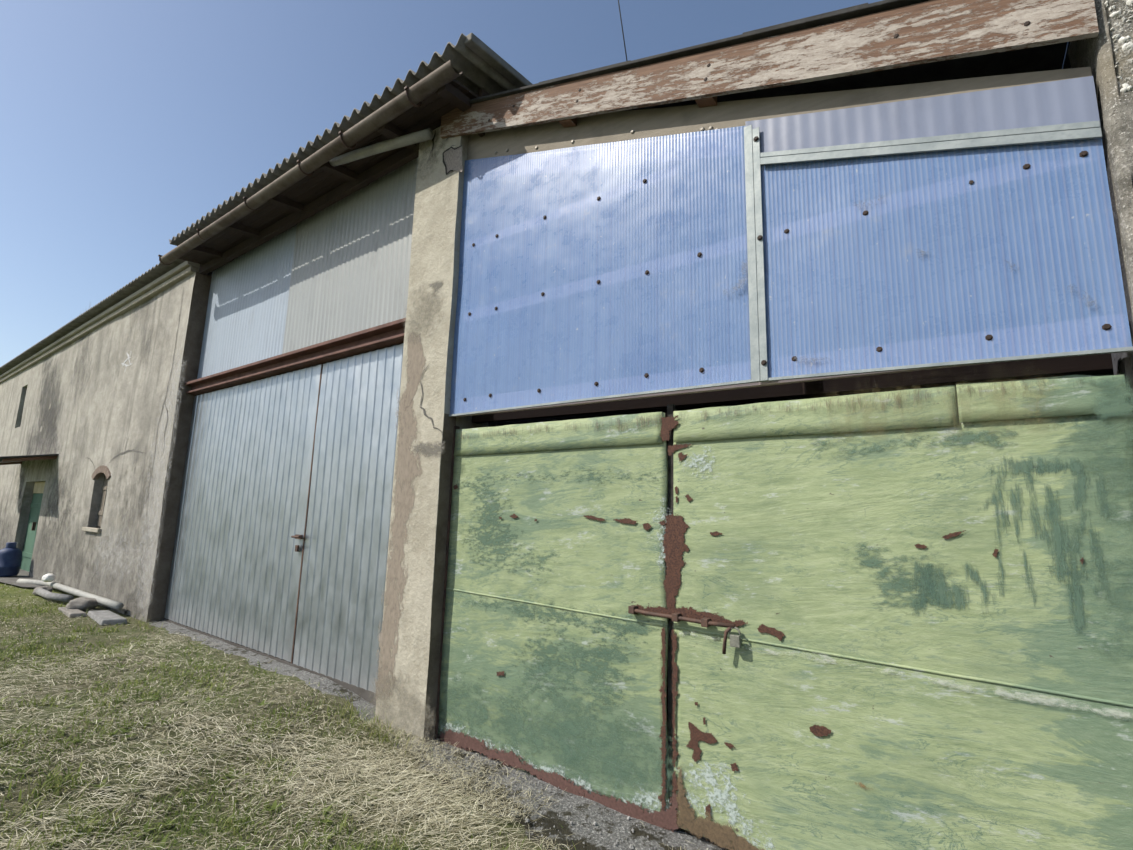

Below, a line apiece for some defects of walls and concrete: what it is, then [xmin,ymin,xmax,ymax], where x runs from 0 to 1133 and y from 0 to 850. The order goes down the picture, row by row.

crack [420,366,443,437]
rust [660,415,693,461]
rust [439,486,785,850]
rust [810,725,831,737]